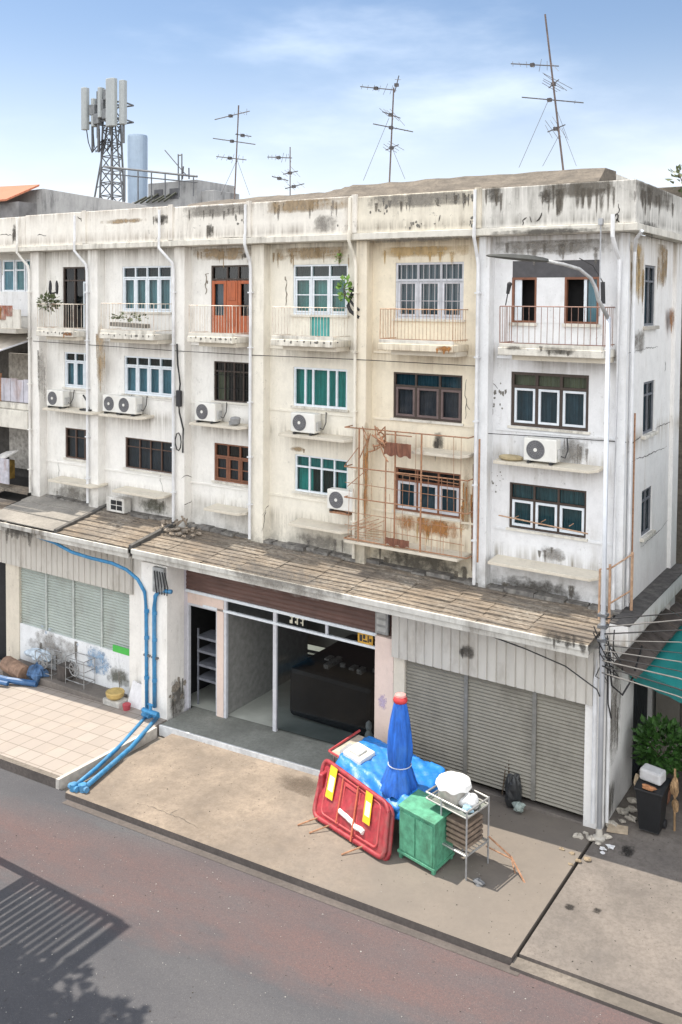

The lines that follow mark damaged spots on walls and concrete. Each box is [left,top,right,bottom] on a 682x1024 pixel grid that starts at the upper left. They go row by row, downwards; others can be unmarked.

water stain [375,193,469,211]
water stain [485,187,502,210]
water stain [540,180,615,214]
water stain [634,182,674,241]
water stain [189,204,248,268]
corrosion [657,245,668,284]
water stain [564,441,588,461]
corrosion [385,465,474,562]
water stain [538,548,564,560]
water stain [171,678,184,718]